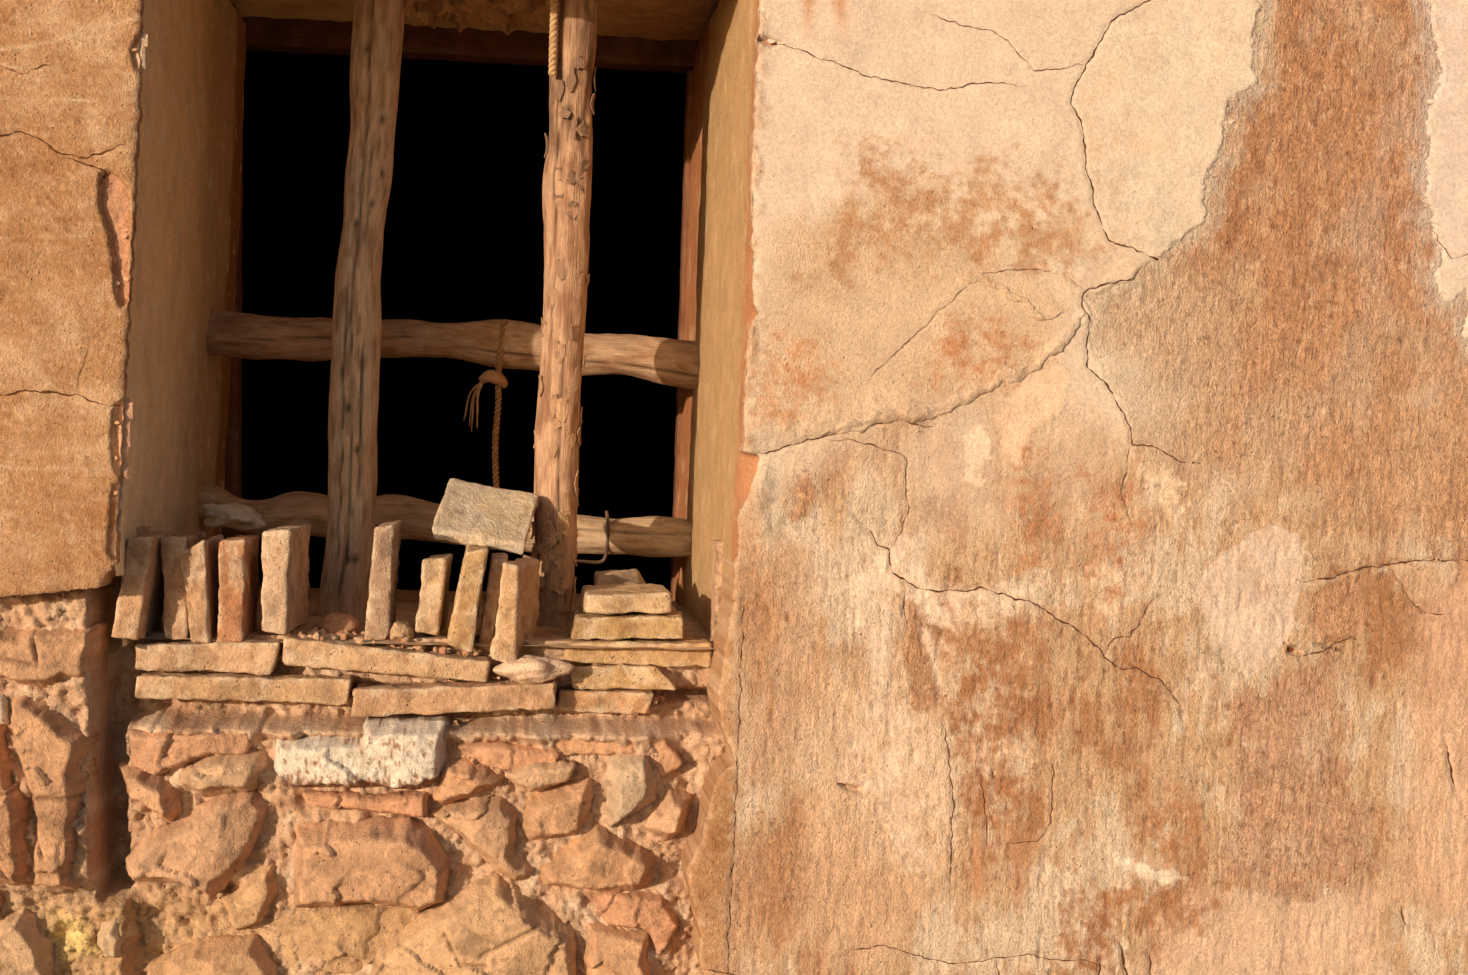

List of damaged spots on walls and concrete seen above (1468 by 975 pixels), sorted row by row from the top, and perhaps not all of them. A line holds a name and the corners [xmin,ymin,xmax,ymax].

crack [0,131,133,187]
crack [761,0,1200,516]
crack [5,336,121,406]
peeling [1084,0,1468,905]
crack [755,421,1184,723]
crack [1298,558,1468,615]
crack [1303,637,1359,656]
crack [702,591,745,975]
crack [944,723,1055,880]
crack [1446,745,1455,789]
crack [839,942,1151,975]